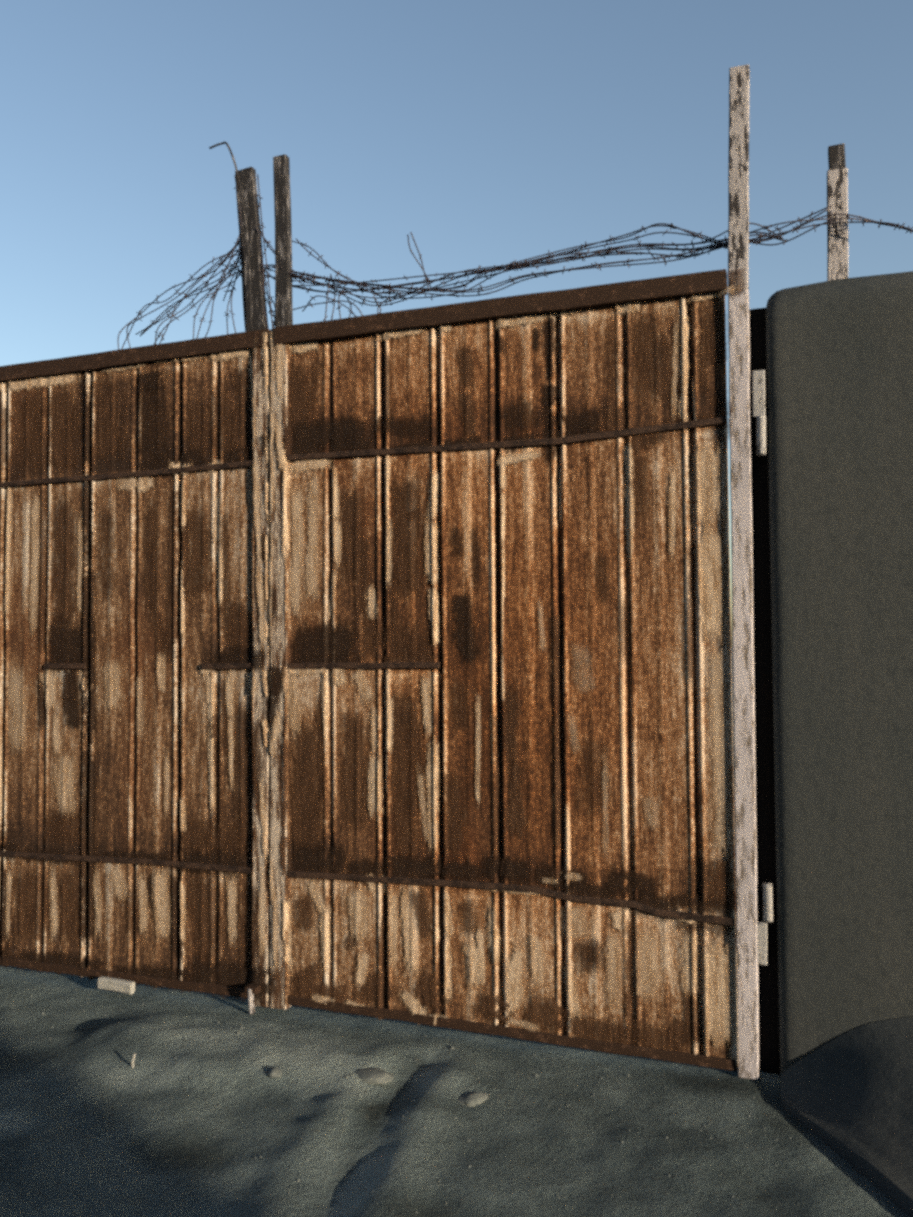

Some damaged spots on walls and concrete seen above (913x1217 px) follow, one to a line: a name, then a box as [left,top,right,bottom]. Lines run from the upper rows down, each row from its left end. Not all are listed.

corrosion [727,269,745,296]
corrosion [282,305,733,522]
corrosion [0,361,734,1052]